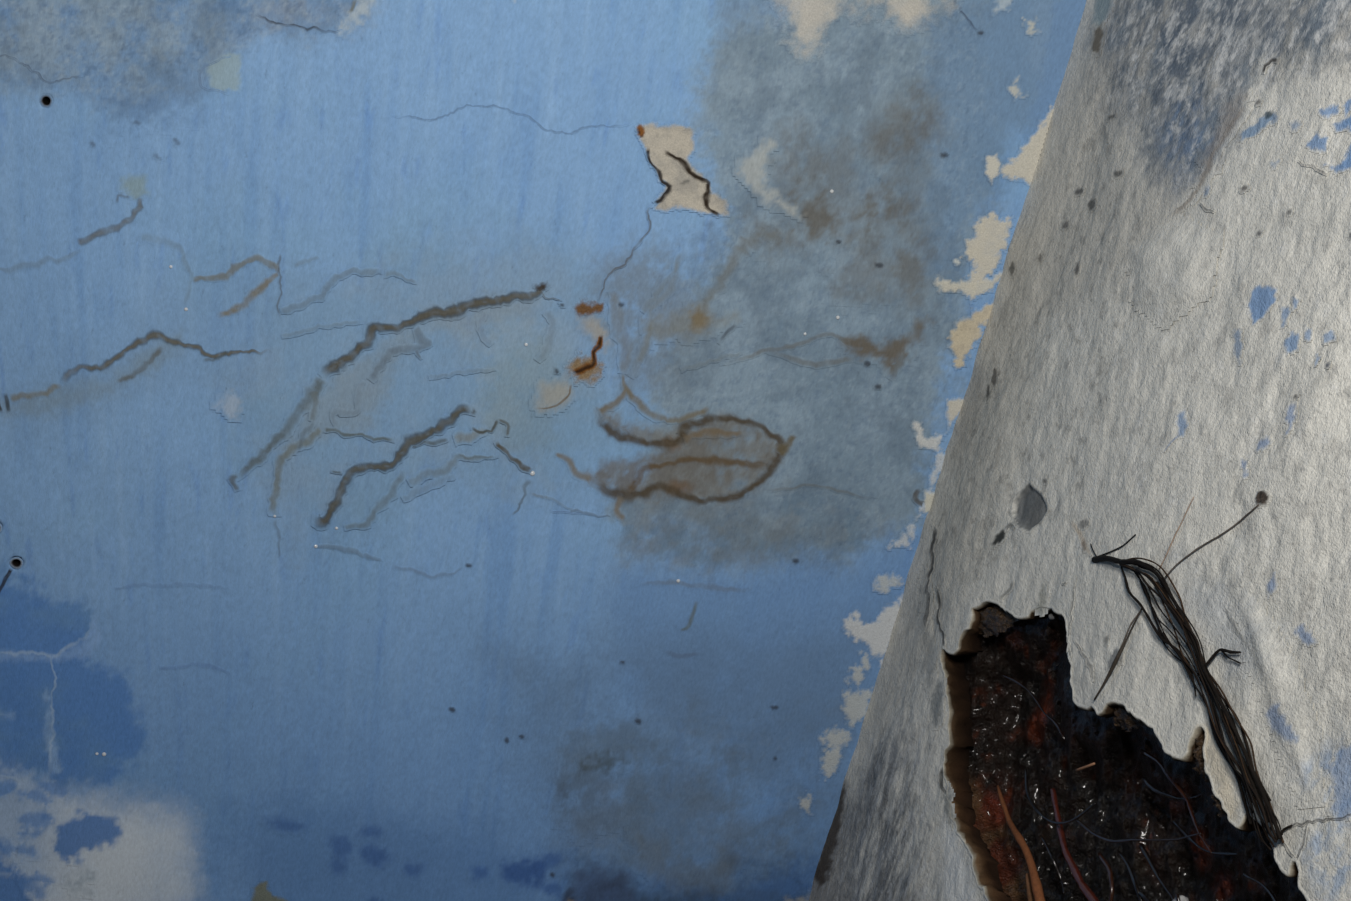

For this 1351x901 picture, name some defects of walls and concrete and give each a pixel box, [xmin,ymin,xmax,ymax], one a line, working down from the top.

peeling [768,0,965,65]
spalling [634,121,730,218]
peeling [732,136,809,223]
peeling [984,103,1054,186]
peeling [932,210,1016,371]
water stain [0,69,968,633]
corrosion [529,296,614,418]
water stain [0,556,220,901]
spalling [939,599,1311,901]
water stain [323,822,429,884]
water stain [464,848,567,901]
water stain [621,826,784,901]